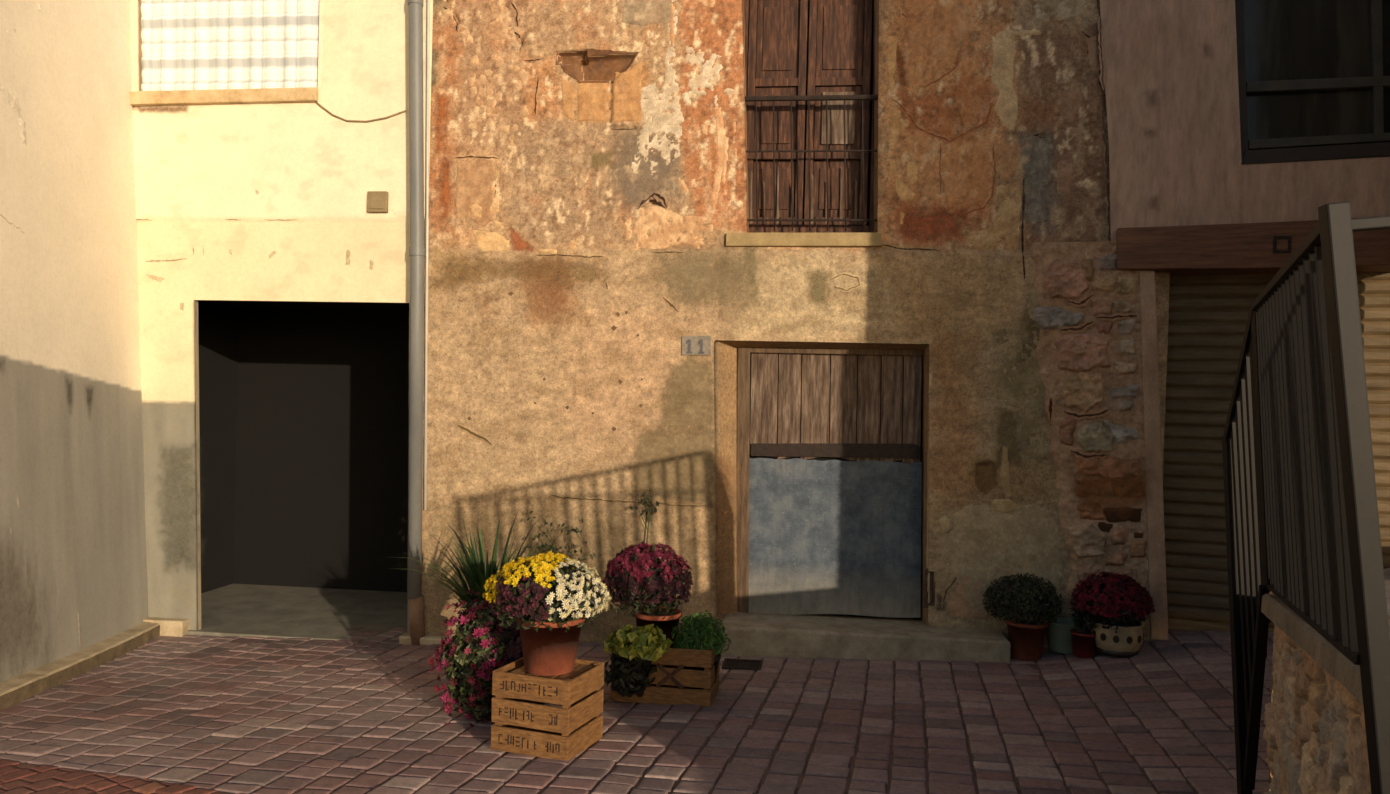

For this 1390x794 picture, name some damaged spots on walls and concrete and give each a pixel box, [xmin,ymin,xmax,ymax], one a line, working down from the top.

spalling [555,49,639,85]
peeling [624,0,737,250]